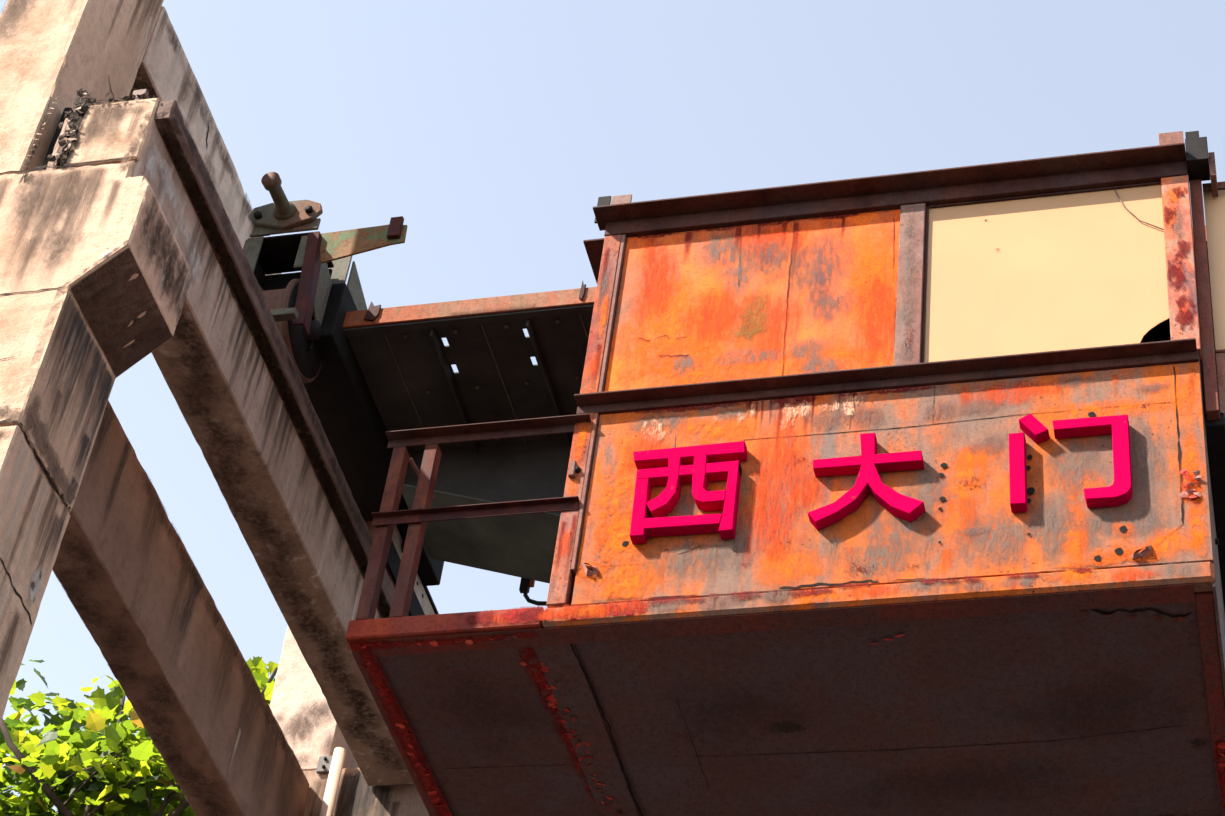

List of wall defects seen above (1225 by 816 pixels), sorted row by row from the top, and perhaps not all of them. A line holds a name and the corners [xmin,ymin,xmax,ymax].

leakage [86,68,157,139]
leakage [17,168,119,265]
rust [624,220,896,385]
leakage [134,0,399,816]
rust [989,383,1042,403]
rust [1060,402,1150,419]
rust [634,395,824,600]
rust [1051,441,1206,582]
crack [0,558,32,625]
leakage [59,573,101,623]
leakage [107,627,134,679]
rust [349,435,660,816]